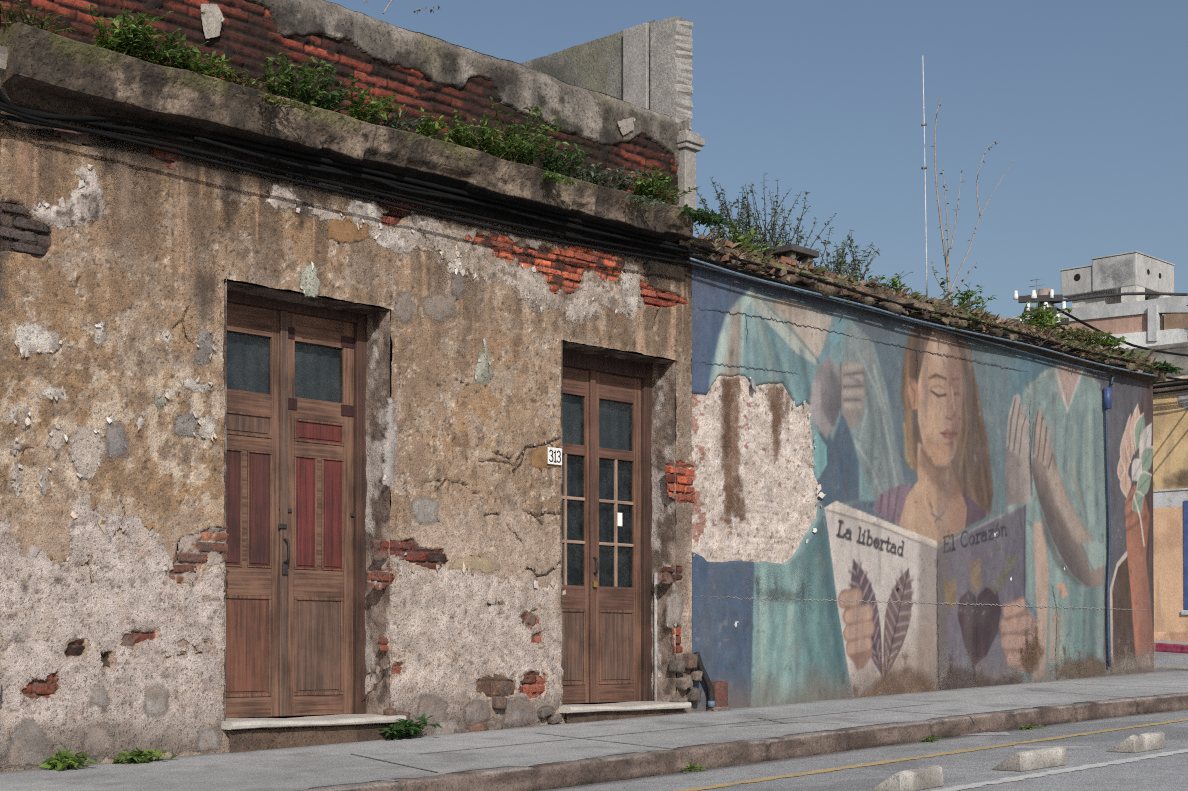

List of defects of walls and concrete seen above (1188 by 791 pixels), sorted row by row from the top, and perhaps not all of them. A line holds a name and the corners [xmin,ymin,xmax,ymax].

spalling [0,0,678,206]
peeling [0,161,105,258]
peeling [266,184,688,325]
spalling [665,375,826,563]
peeling [0,402,229,772]
peeling [367,536,566,737]
spalling [659,565,683,584]